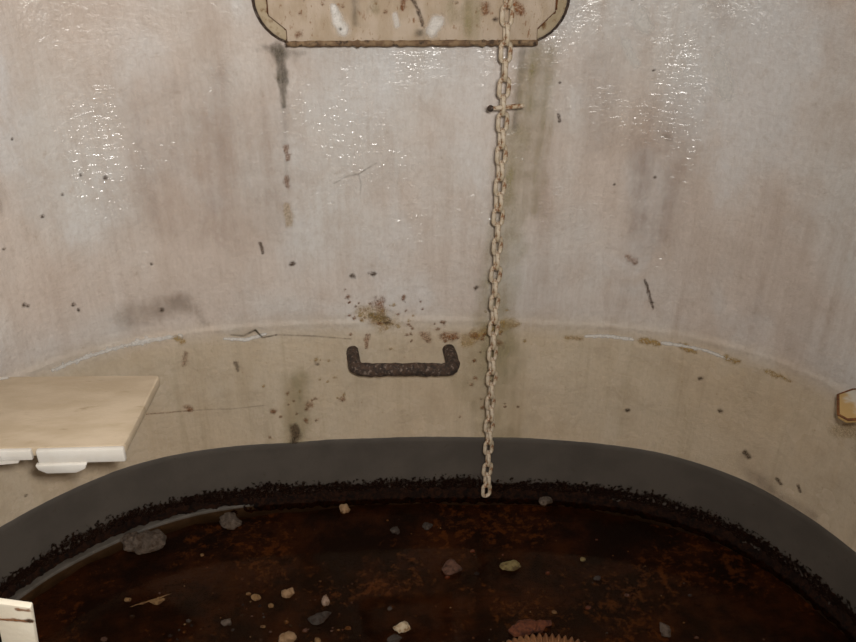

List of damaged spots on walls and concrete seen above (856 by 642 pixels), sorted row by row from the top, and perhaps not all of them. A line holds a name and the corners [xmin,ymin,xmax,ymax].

leakage [275,49,286,91]
corrosion [345,289,517,346]